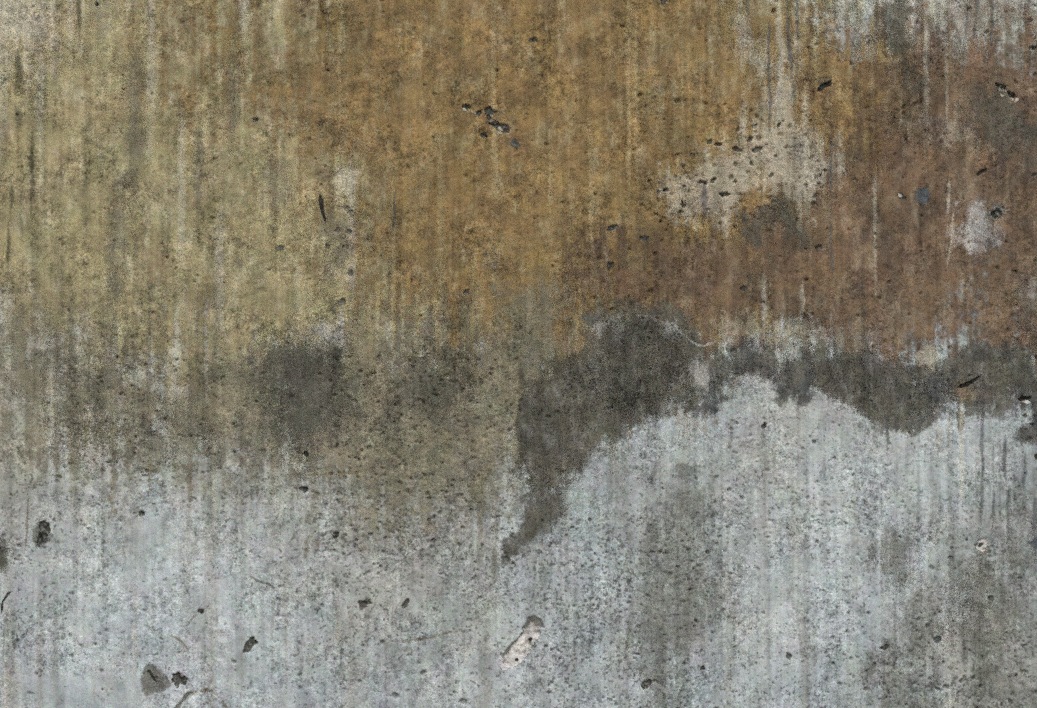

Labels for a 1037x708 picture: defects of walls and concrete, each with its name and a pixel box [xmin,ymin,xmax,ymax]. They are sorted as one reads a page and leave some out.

water stain [0,0,1037,564]
corrosion [149,0,925,370]
spalling [498,615,544,670]